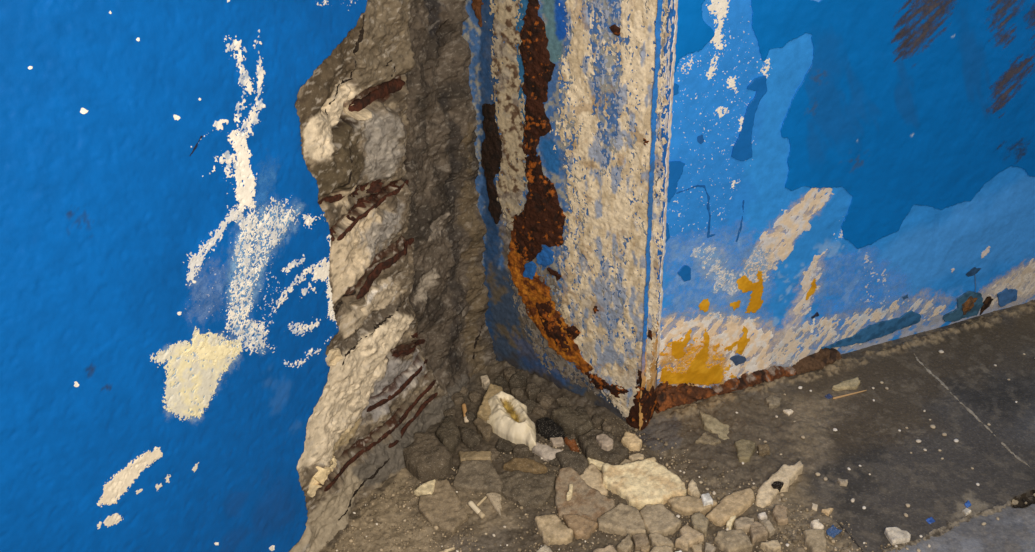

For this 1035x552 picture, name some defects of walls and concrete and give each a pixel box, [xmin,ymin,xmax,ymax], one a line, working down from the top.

corrosion [471,0,484,27]
corrosion [895,0,952,61]
corrosion [991,0,1035,44]
corrosion [992,57,1034,112]
peeling [489,0,528,254]
corrosion [481,0,842,430]
peeling [507,0,1035,418]
spalling [150,0,496,552]
crack [914,354,1030,467]
peeling [97,446,171,529]
crack [836,495,1033,552]